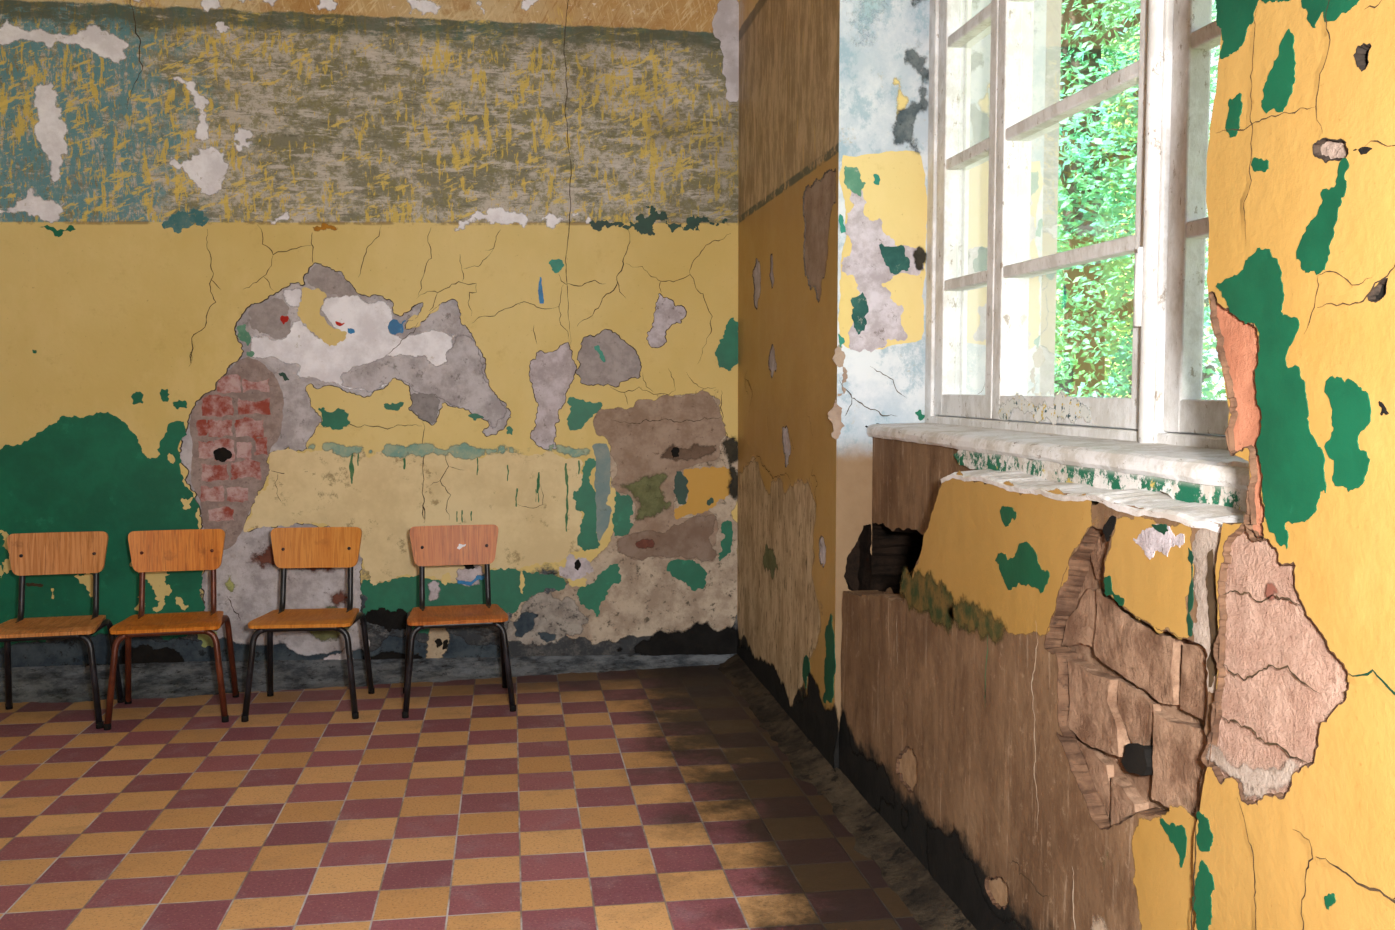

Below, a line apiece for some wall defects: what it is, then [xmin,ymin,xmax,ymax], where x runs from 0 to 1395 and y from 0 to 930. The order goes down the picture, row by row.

crack [189,230,314,366]
peeling [803,150,927,439]
crack [1217,2,1330,247]
peeling [1215,0,1359,59]
peeling [1296,138,1372,275]
crack [1304,254,1395,334]
spalling [0,254,836,707]
flaking render [844,248,1389,930]
water stain [617,622,920,833]
water stain [1031,626,1039,819]
water stain [926,822,1025,930]
crack [1293,829,1395,930]